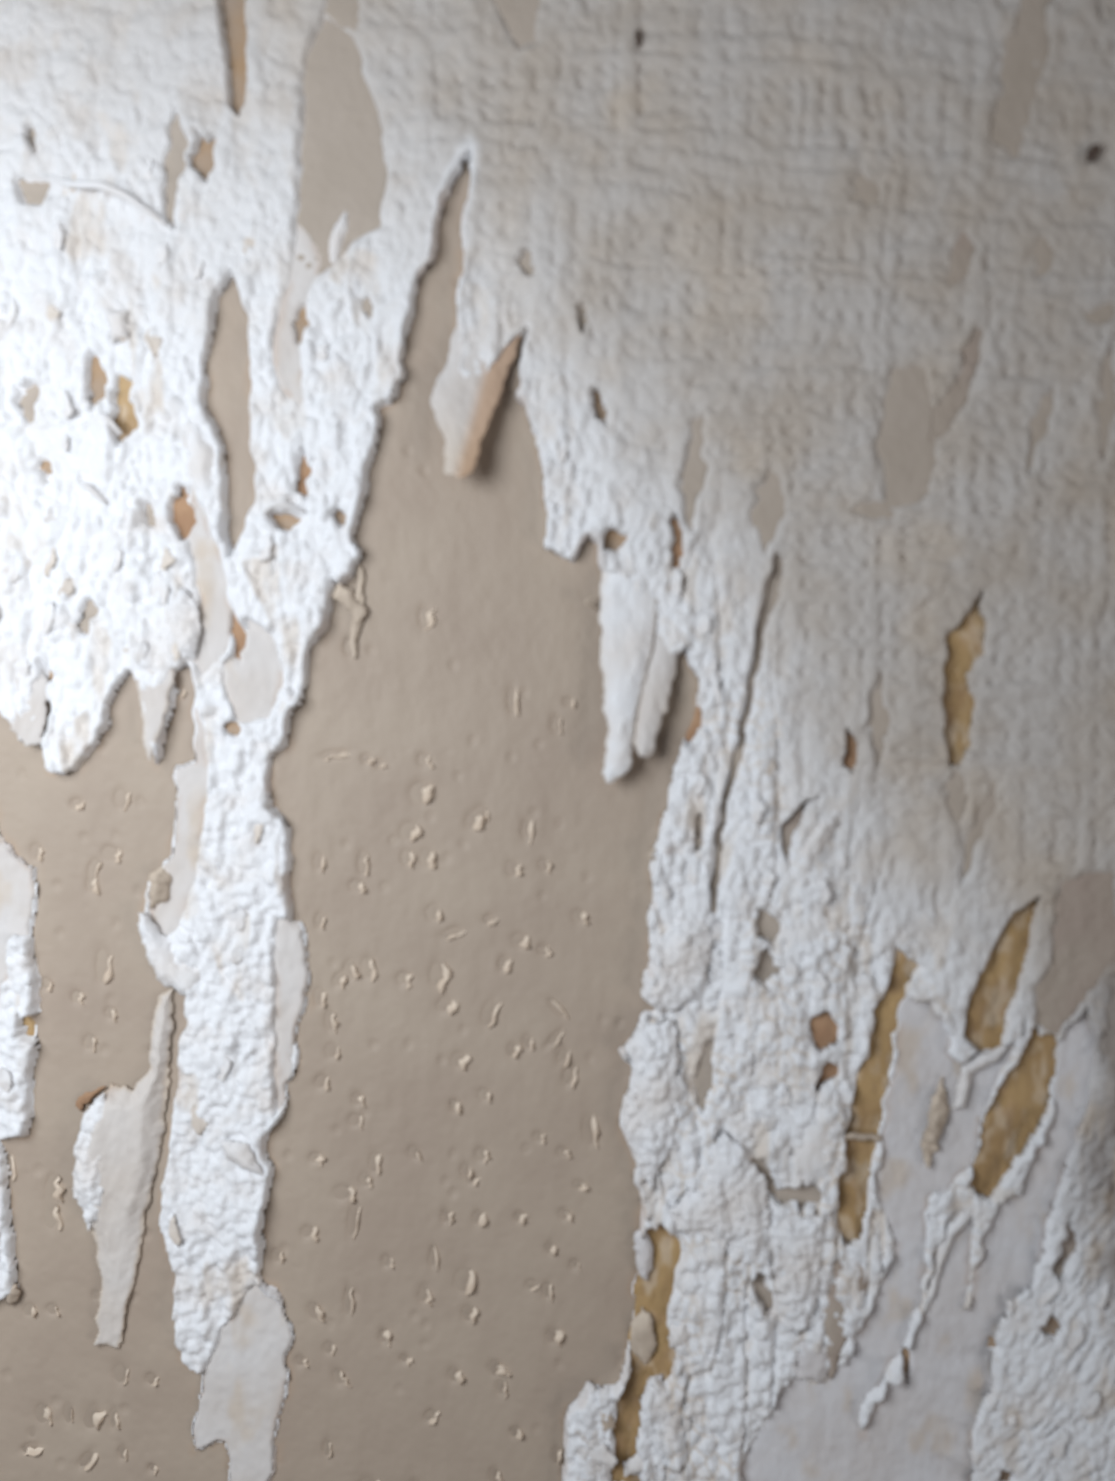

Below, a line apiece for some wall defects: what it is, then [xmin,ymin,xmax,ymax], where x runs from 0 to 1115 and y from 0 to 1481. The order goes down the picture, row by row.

peeling [273,0,388,404]
peeling [0,160,722,1481]
peeling [670,872,1115,1481]